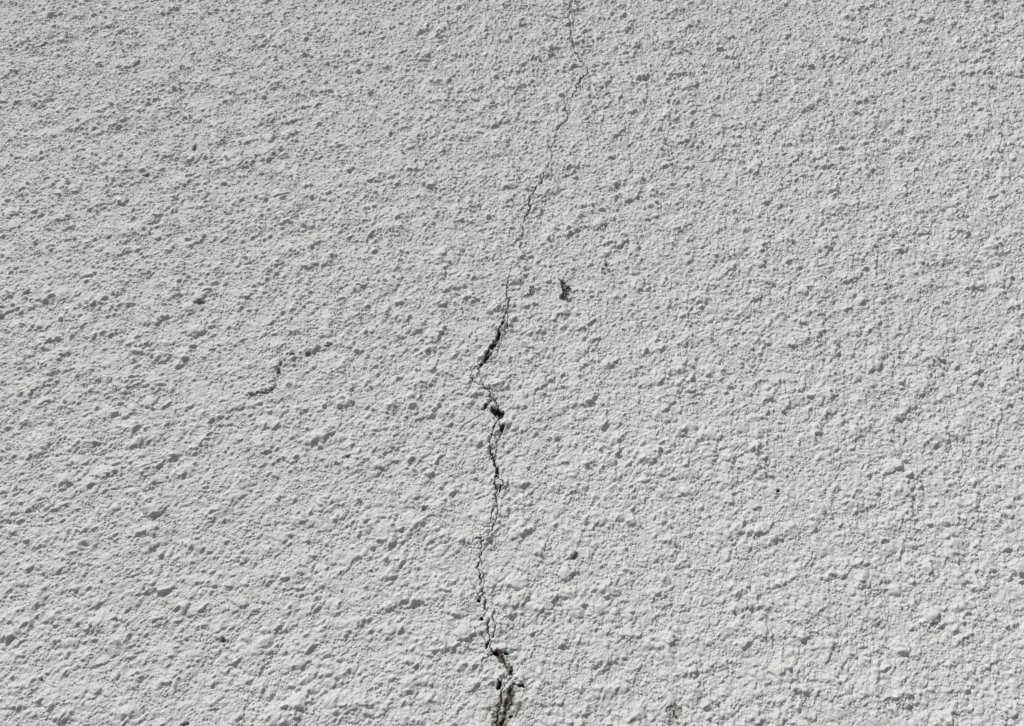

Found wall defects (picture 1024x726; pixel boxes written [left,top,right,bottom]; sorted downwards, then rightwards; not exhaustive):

crack [470,0,614,726]